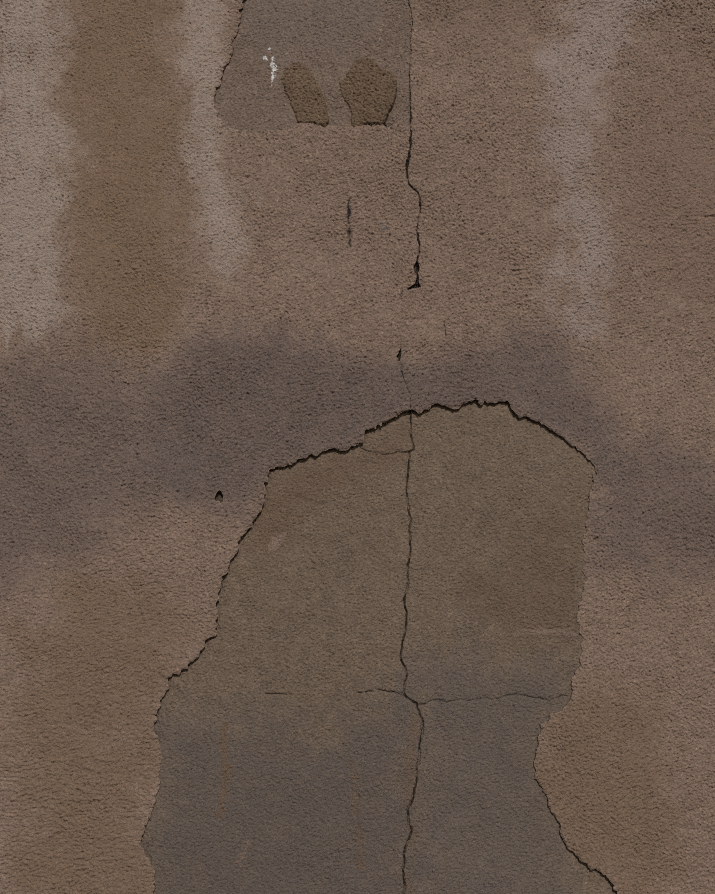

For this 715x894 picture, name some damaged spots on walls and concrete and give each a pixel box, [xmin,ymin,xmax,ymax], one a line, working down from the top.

flaking render [214,0,412,136]
crack [401,0,421,295]
flaking render [140,399,619,894]
crack [357,349,567,884]